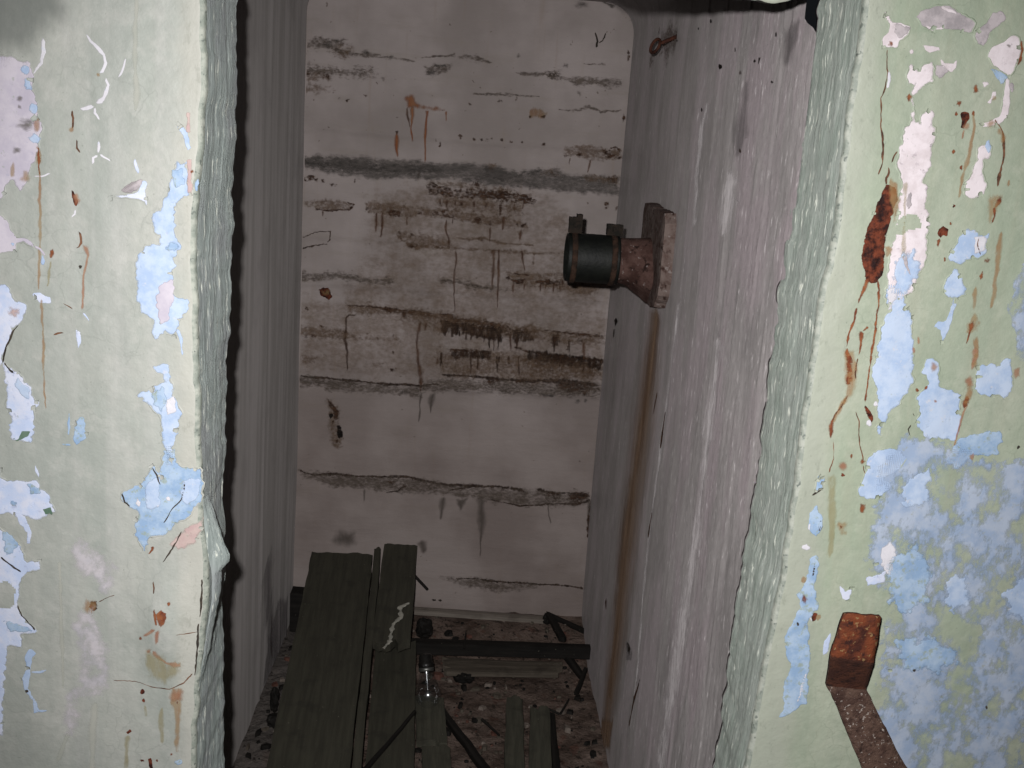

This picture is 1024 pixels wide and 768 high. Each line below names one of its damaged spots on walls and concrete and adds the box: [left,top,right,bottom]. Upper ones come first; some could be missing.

peeling [0,283,89,446]
peeling [108,113,199,355]
leakage [306,37,378,91]
leakage [305,156,619,194]
leakage [571,77,619,86]
rust [829,152,898,477]
peeling [857,4,1024,768]
rust [937,222,951,261]
rust [955,101,975,138]
rust [992,120,1005,222]
peeling [0,465,56,736]
peeling [120,363,230,691]